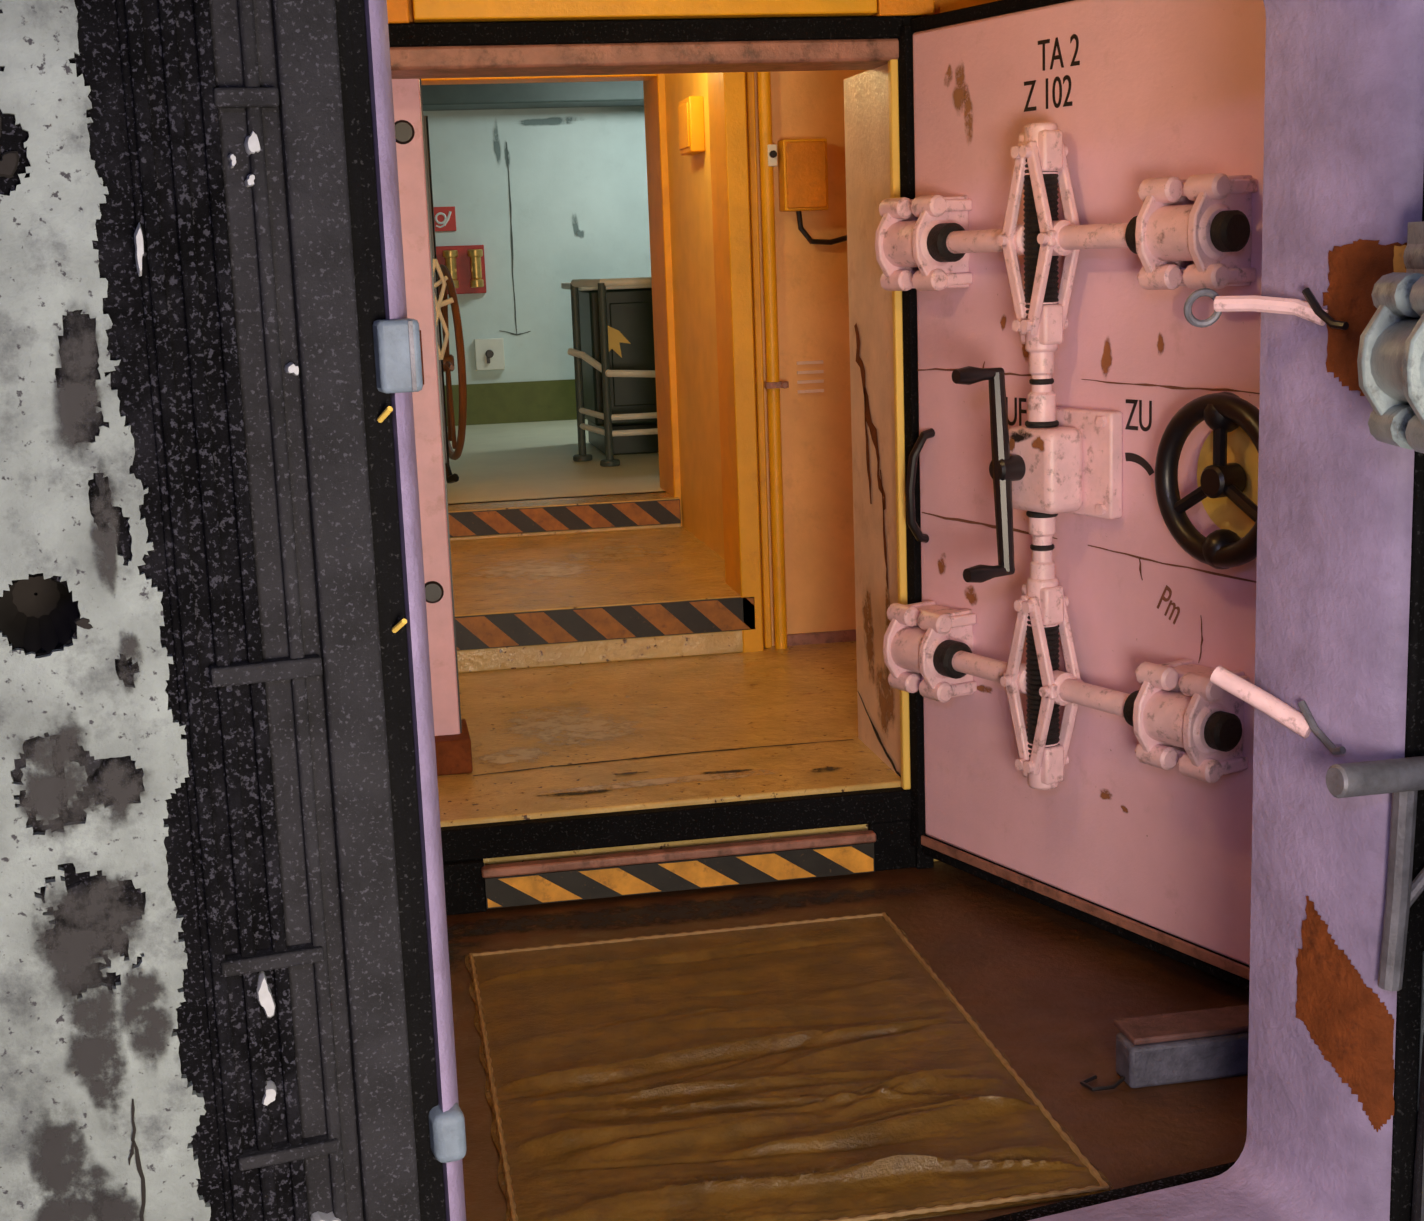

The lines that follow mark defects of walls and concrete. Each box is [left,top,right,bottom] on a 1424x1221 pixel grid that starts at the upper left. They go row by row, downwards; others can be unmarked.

rust [946,66,972,141]
rust [1323,239,1407,396]
leakage [56,318,100,449]
leakage [91,473,118,591]
hole [0,575,93,656]
leakage [120,635,141,691]
leakage [19,723,143,834]
leakage [35,876,172,1113]
rust [1295,896,1395,1132]
leakage [29,1120,142,1221]